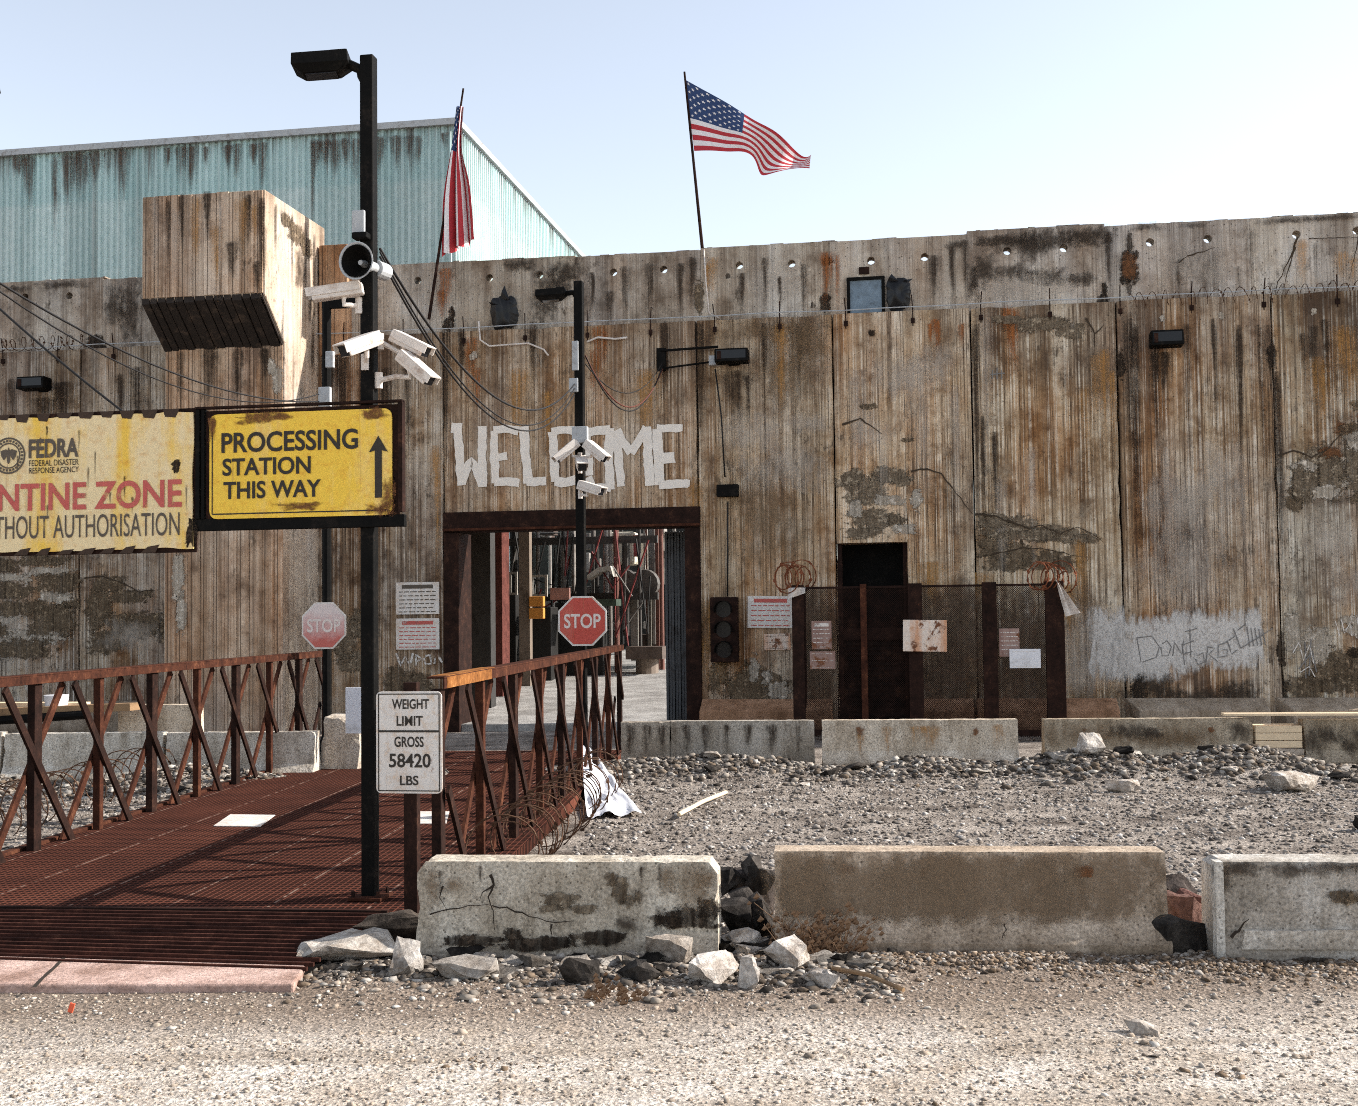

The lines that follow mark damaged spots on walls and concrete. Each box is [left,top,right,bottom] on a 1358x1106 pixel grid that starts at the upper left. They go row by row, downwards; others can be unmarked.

leakage [762,258,785,306]
leakage [929,226,1111,295]
spalling [1285,400,1358,515]
spalling [833,465,924,540]
spalling [976,511,1101,576]
spalling [0,553,188,661]
peeling [1070,608,1358,698]
crack [430,874,570,938]
leakage [618,920,634,931]